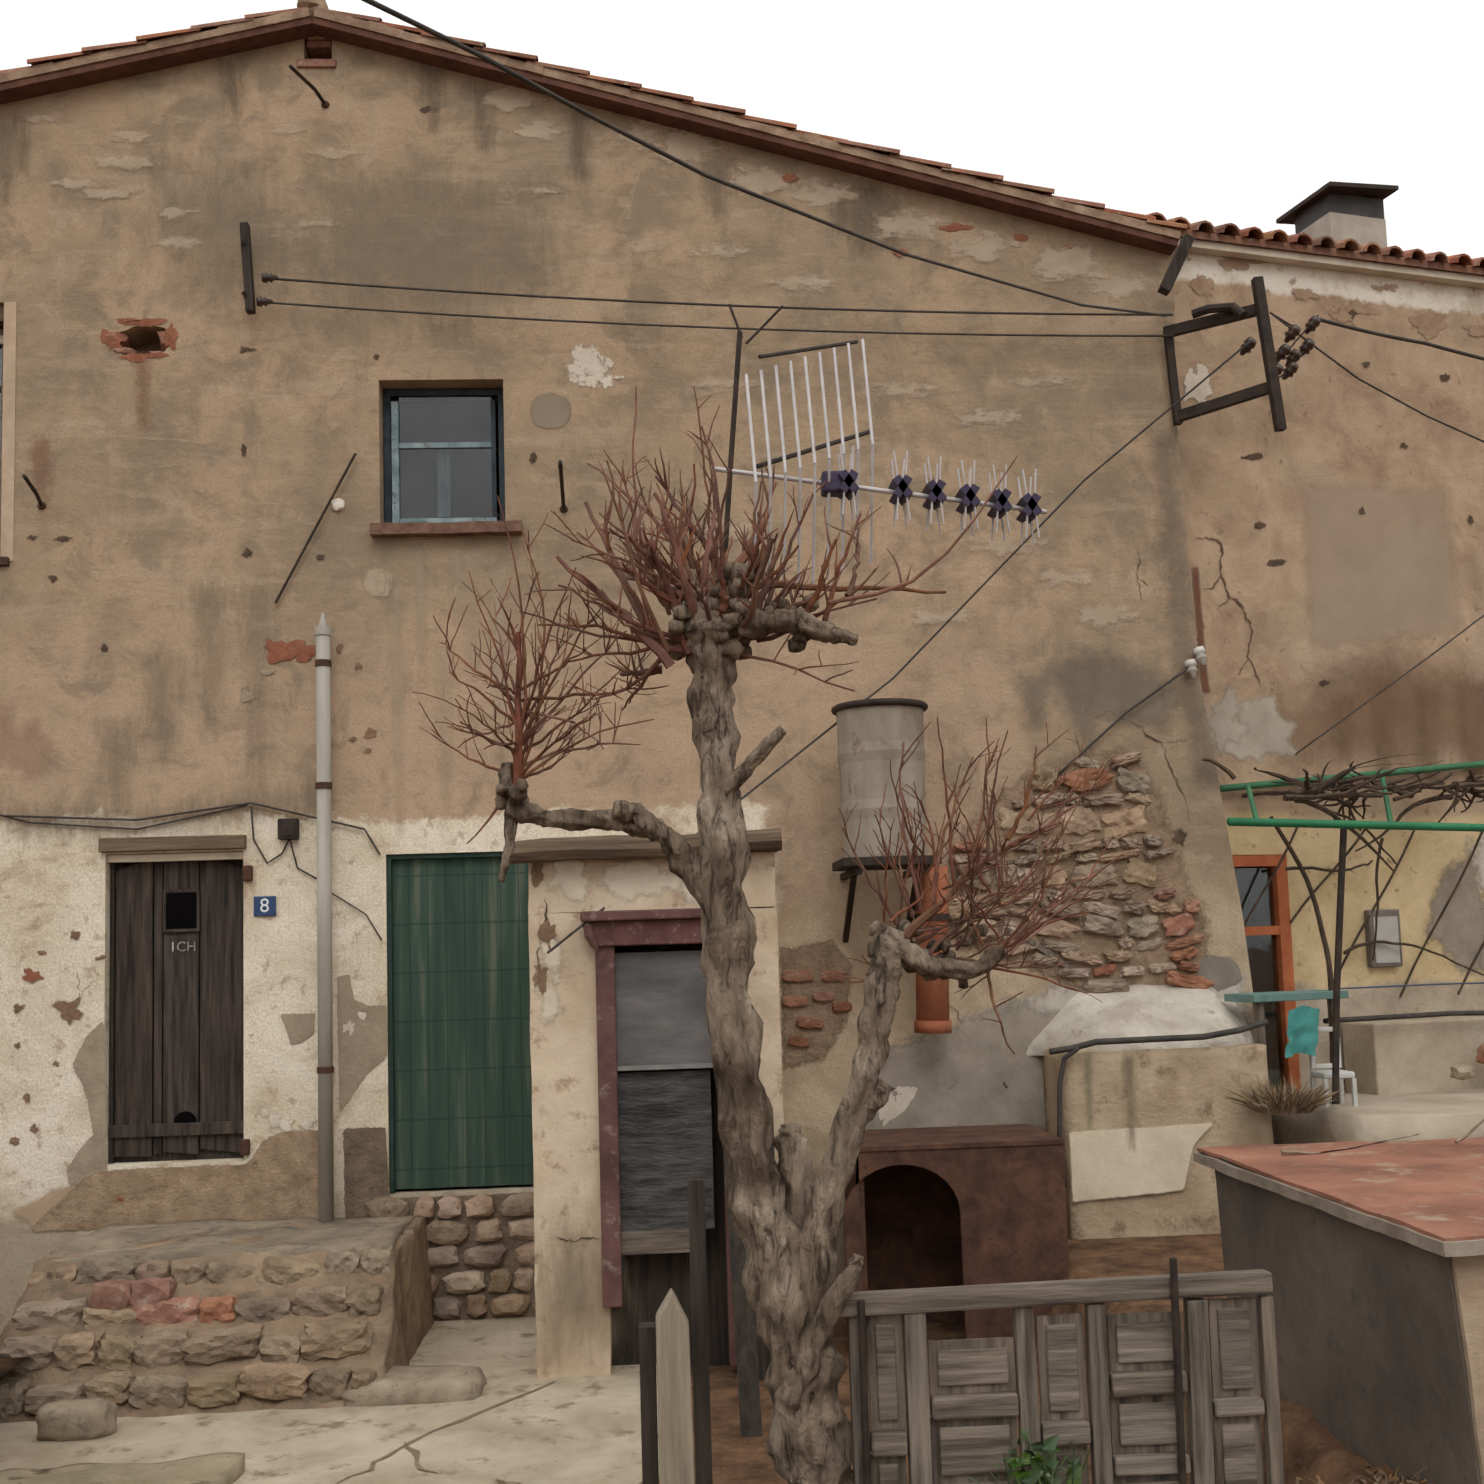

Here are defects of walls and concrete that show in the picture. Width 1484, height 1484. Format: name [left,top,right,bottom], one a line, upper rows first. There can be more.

spalling [100,318,178,362]
peeling [531,343,624,429]
flaking render [264,640,316,664]
crack [1195,537,1260,683]
flaking render [349,727,377,753]
peeling [1207,686,1296,762]
water stain [1284,667,1484,776]
flaking render [865,747,1248,1131]
flaking render [780,940,853,1070]
peeling [1069,1123,1213,1202]